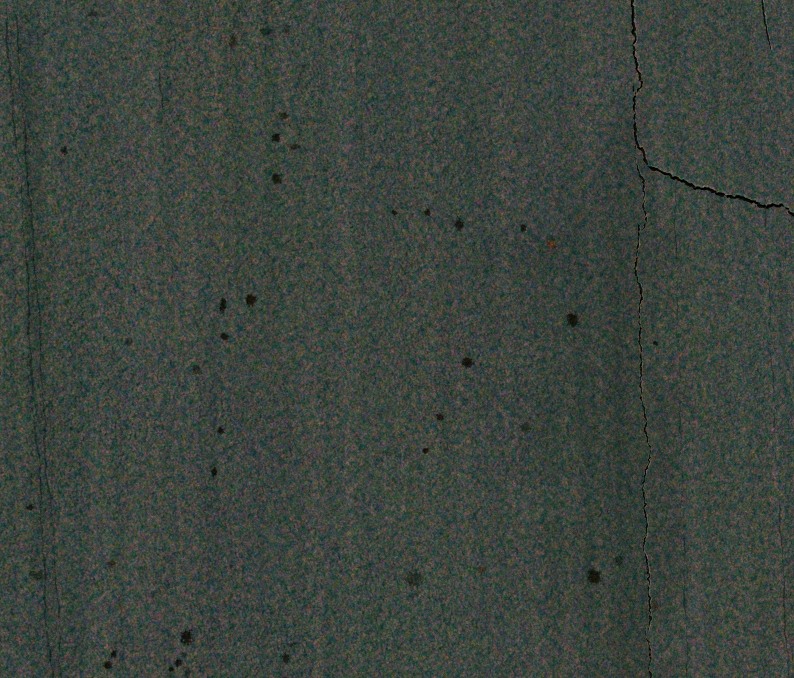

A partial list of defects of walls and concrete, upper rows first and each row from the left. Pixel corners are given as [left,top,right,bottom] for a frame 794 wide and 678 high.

crack [629,0,794,678]